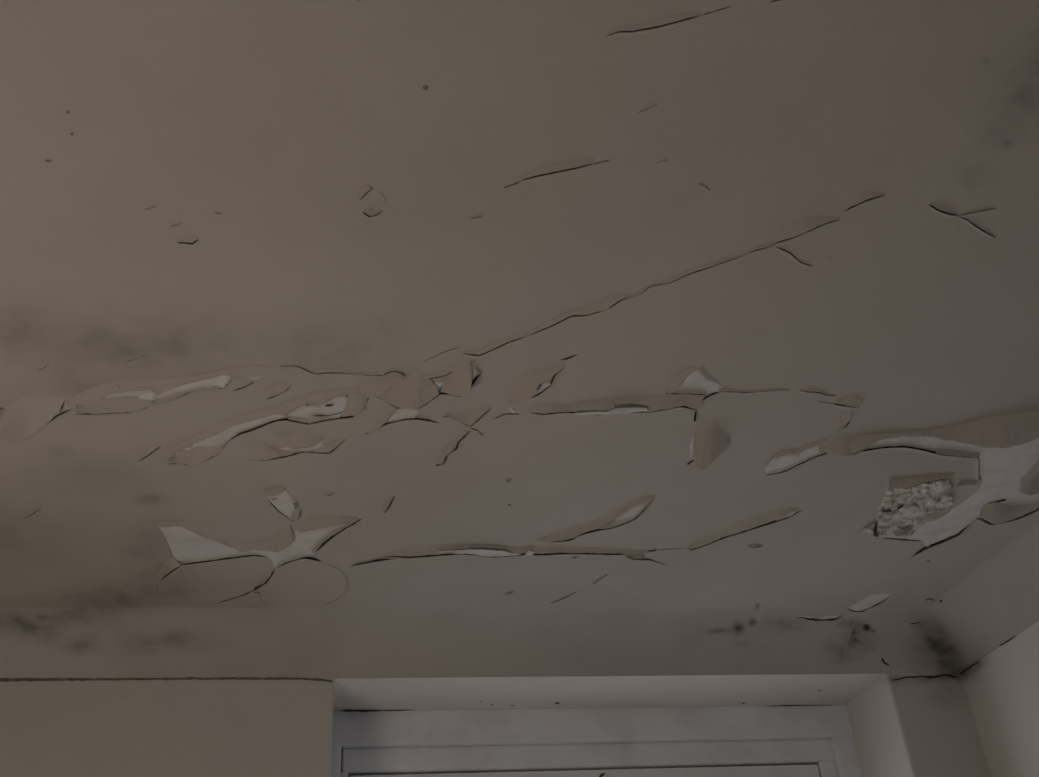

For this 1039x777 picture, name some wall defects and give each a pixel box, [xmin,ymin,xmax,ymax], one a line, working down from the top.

crack [428,192,885,360]
peeling [162,358,483,469]
peeling [495,355,730,470]
peeling [154,487,362,604]
peeling [352,495,802,567]
peeling [765,411,1039,558]